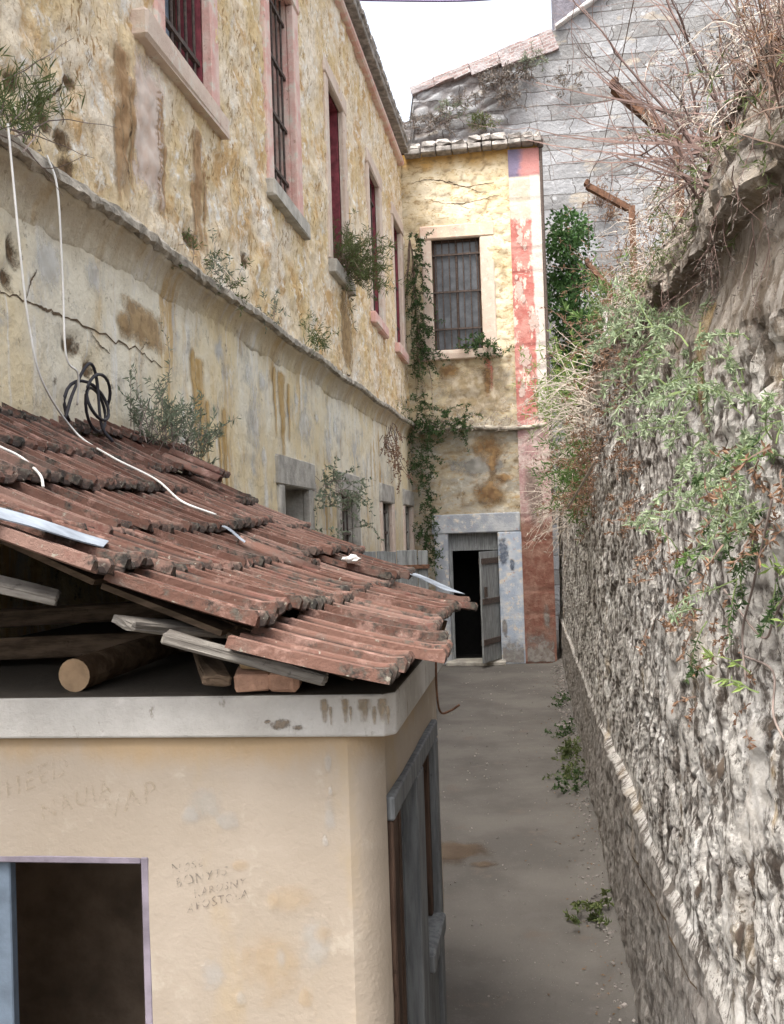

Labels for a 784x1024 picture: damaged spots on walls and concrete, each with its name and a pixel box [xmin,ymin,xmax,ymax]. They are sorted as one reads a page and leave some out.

leakage [114,44,137,193]
leakage [158,92,167,215]
crack [414,179,499,209]
crack [0,270,162,368]
leakage [451,435,511,504]
leakage [321,699,390,722]